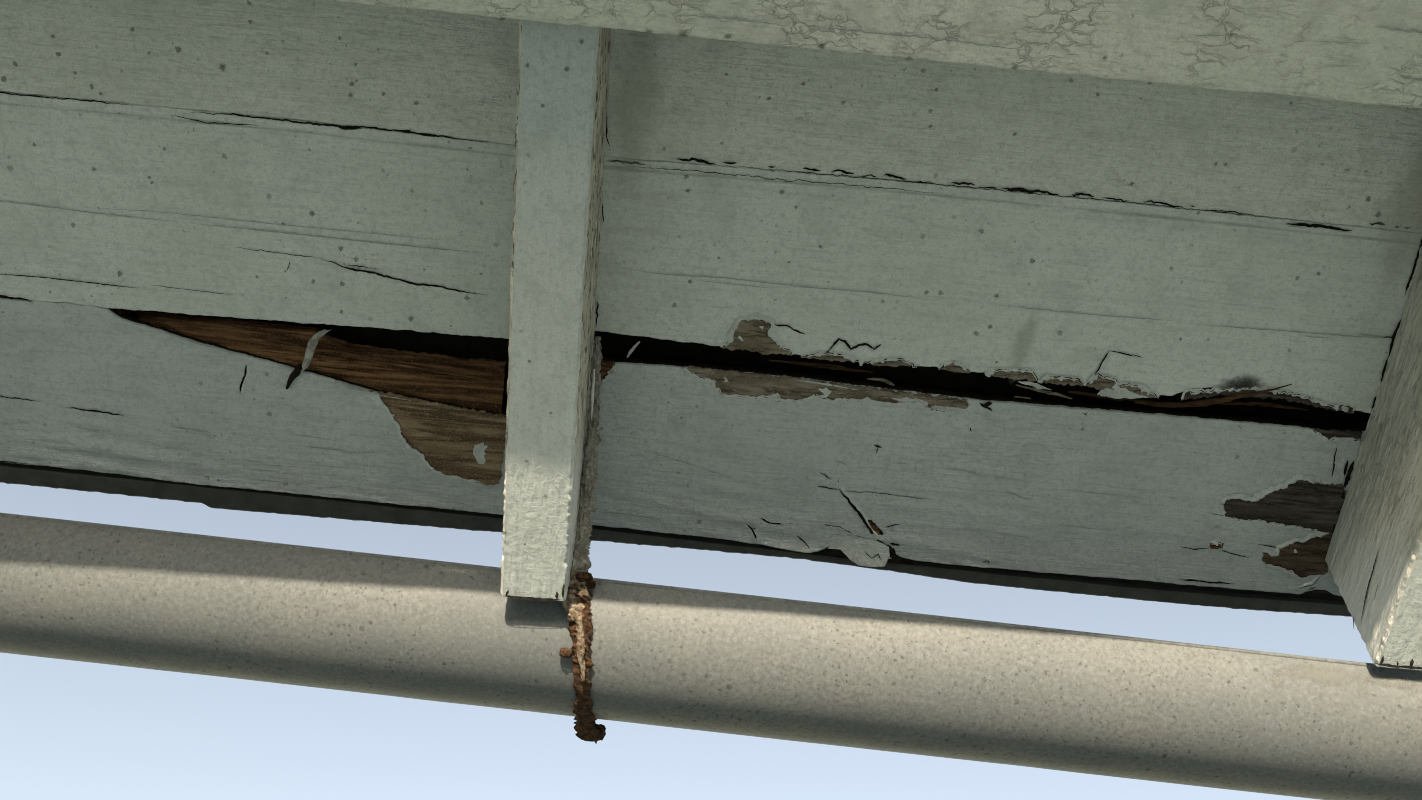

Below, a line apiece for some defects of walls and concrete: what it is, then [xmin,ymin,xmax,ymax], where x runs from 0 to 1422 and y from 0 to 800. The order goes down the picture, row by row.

crack [0,92,128,105]
crack [174,112,487,143]
peeling [286,329,332,389]
peeling [719,312,918,368]
crack [606,121,1422,533]
peeling [684,365,972,414]
crack [1,396,123,469]
peeling [337,382,506,487]
crack [745,445,1144,564]
peeling [1210,539,1224,549]
crack [1180,544,1276,584]
peeling [1219,473,1346,581]